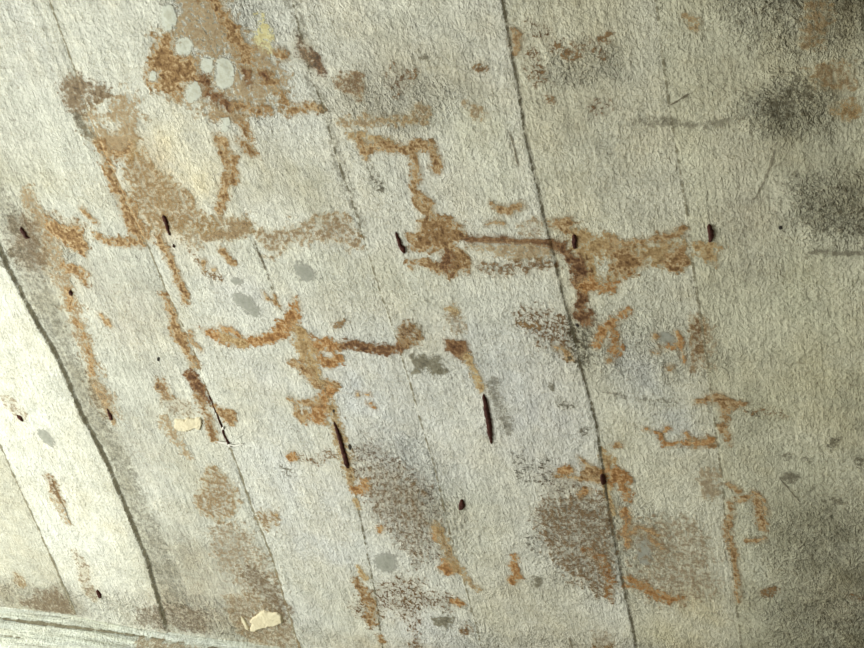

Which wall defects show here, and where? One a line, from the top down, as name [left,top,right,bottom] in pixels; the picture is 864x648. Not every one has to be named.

rust [508,19,615,87]
rust [336,103,729,373]
rust [20,0,486,648]
peeling [174,417,203,432]
rust [644,393,788,449]
rust [528,442,769,608]
rust [506,553,524,586]
peeling [241,610,283,632]